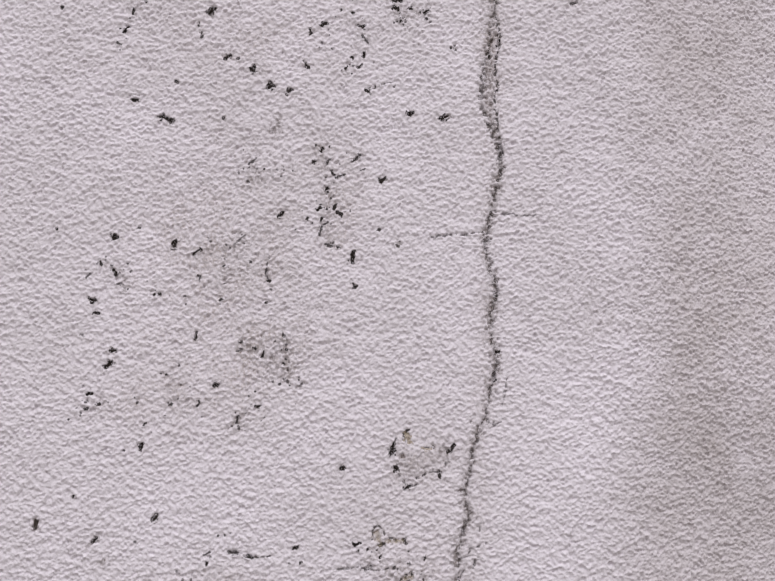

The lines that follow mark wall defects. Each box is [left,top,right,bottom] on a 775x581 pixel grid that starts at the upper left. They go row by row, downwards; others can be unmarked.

crack [488,17,501,139]